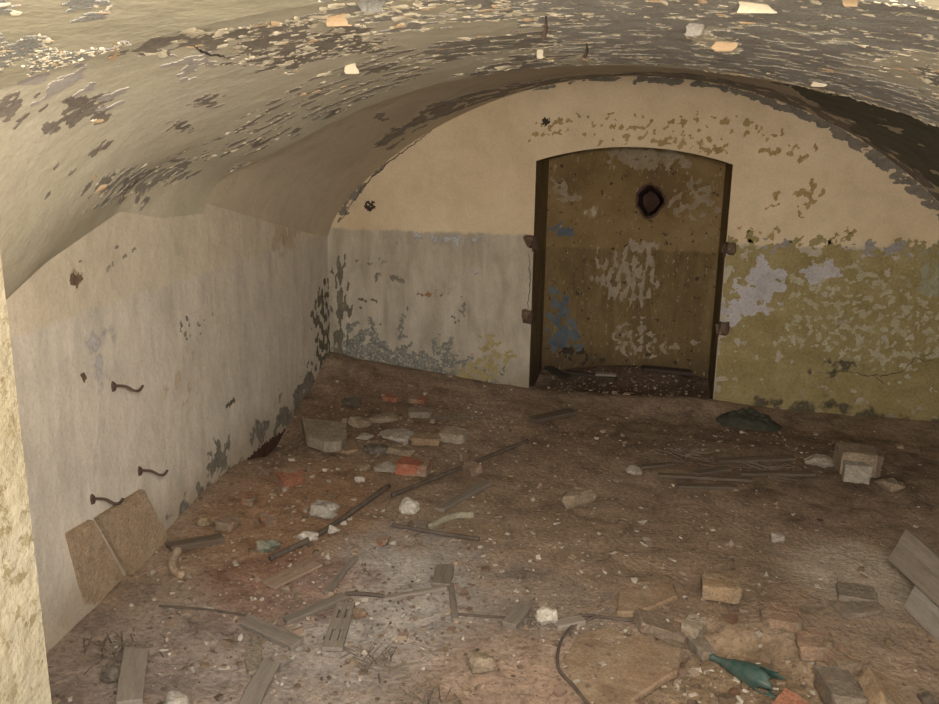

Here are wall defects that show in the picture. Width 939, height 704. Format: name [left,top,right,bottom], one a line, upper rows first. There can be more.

peeling [0,0,939,223]
flaking render [69,260,84,289]
peeling [714,226,939,422]
peeling [456,334,517,384]
flaking render [247,429,286,460]